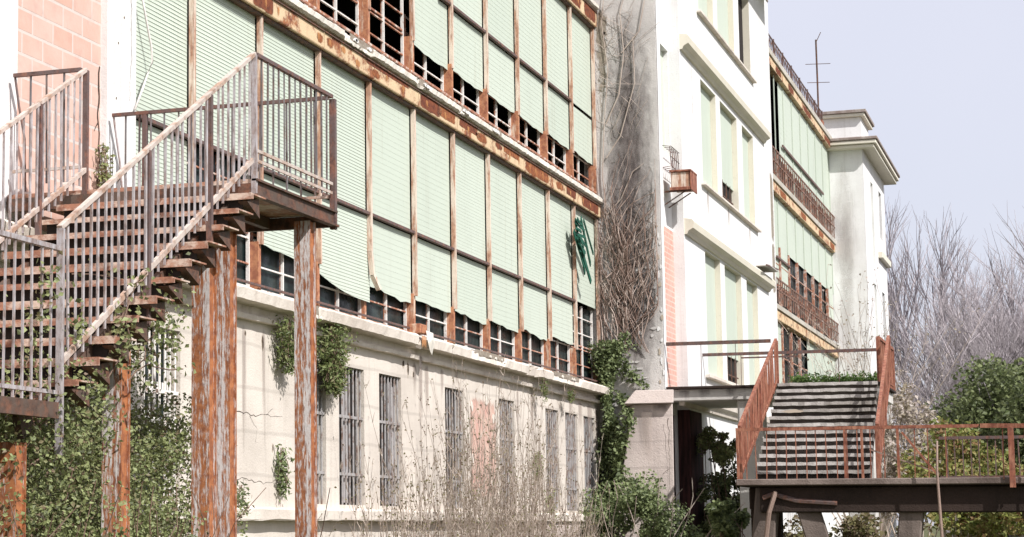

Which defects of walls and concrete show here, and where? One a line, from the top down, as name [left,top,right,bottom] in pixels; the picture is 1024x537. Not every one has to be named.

rust [318,33,346,54]
rust [356,59,409,93]
leakage [596,10,607,103]
rust [421,94,599,214]
flaking render [470,399,496,496]